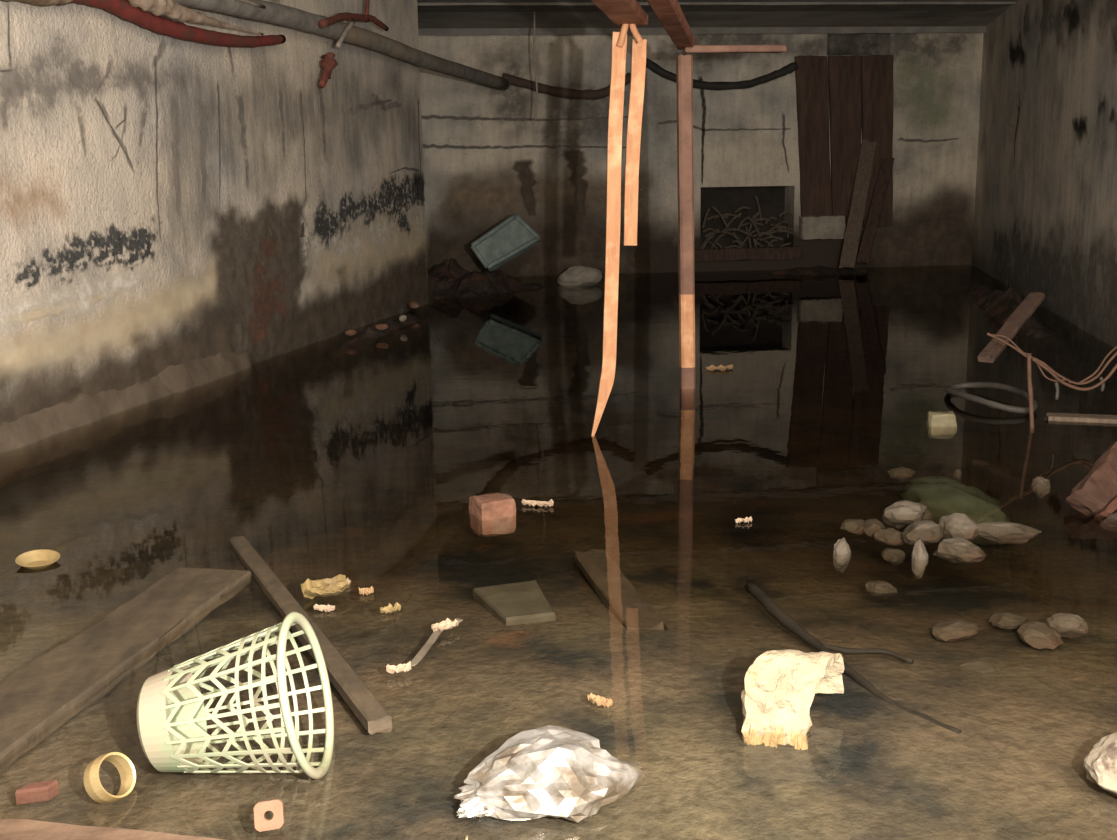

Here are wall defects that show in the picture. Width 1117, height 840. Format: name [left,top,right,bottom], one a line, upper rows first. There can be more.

water stain [672,33,965,64]
water stain [173,74,415,232]
water stain [251,83,609,372]
water stain [619,179,648,274]
water stain [0,266,235,423]